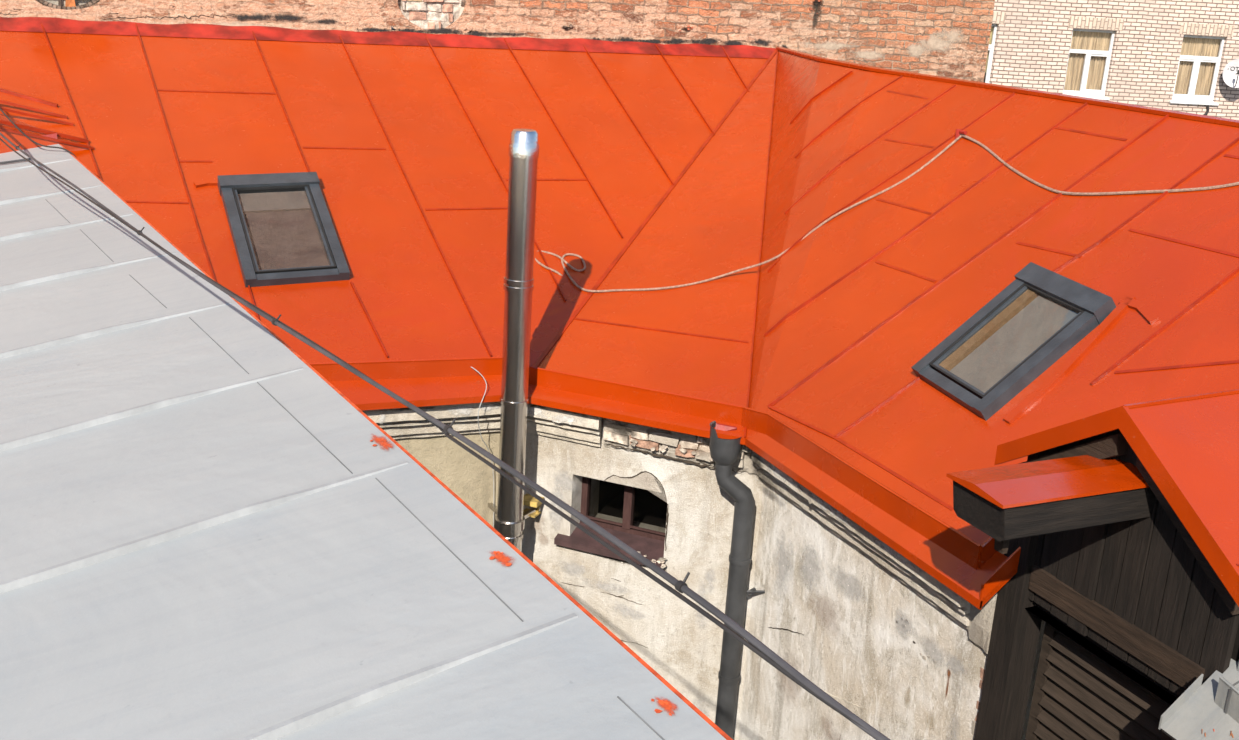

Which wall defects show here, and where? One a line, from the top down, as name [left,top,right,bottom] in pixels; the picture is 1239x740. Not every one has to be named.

flaking render [597,418,715,568]